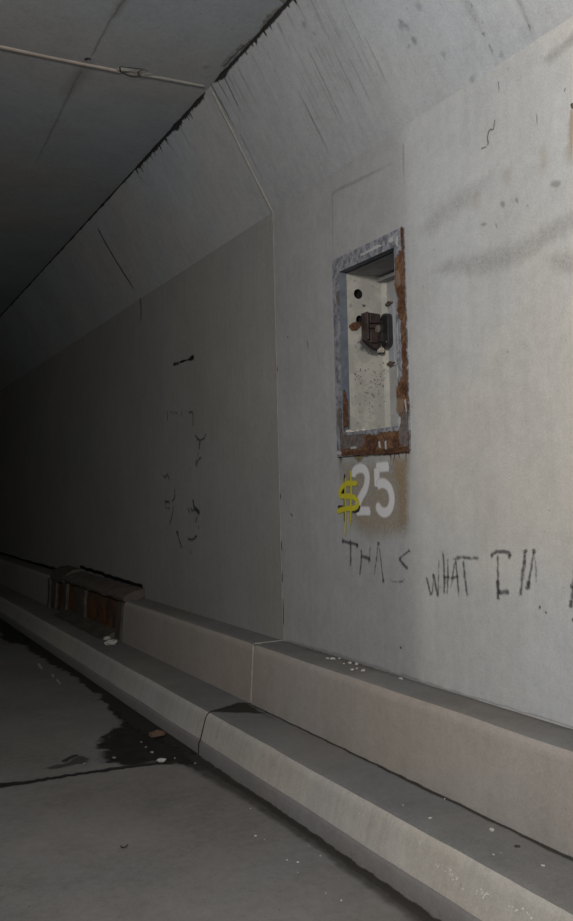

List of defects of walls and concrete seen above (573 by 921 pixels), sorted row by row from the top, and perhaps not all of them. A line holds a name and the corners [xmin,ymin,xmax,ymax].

damp [0,0,297,317]
damp [49,755,88,769]
damp [97,692,198,768]